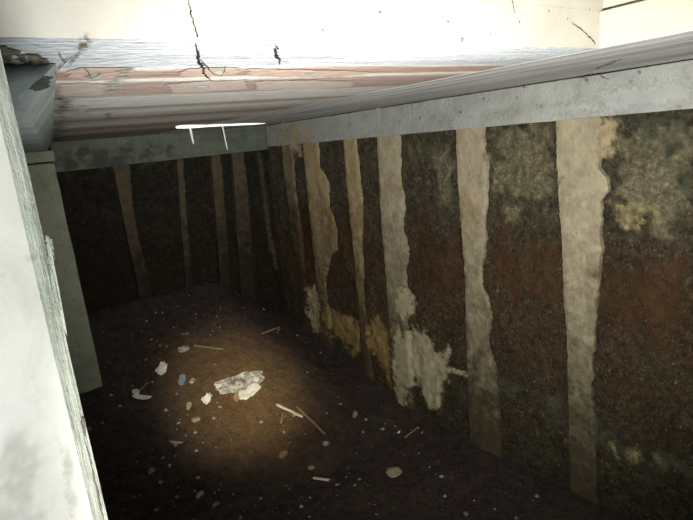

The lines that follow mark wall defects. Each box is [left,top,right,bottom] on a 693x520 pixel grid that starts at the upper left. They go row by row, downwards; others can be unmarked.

spalling [0,46,50,66]
crack [189,5,226,81]
water stain [305,285,468,410]